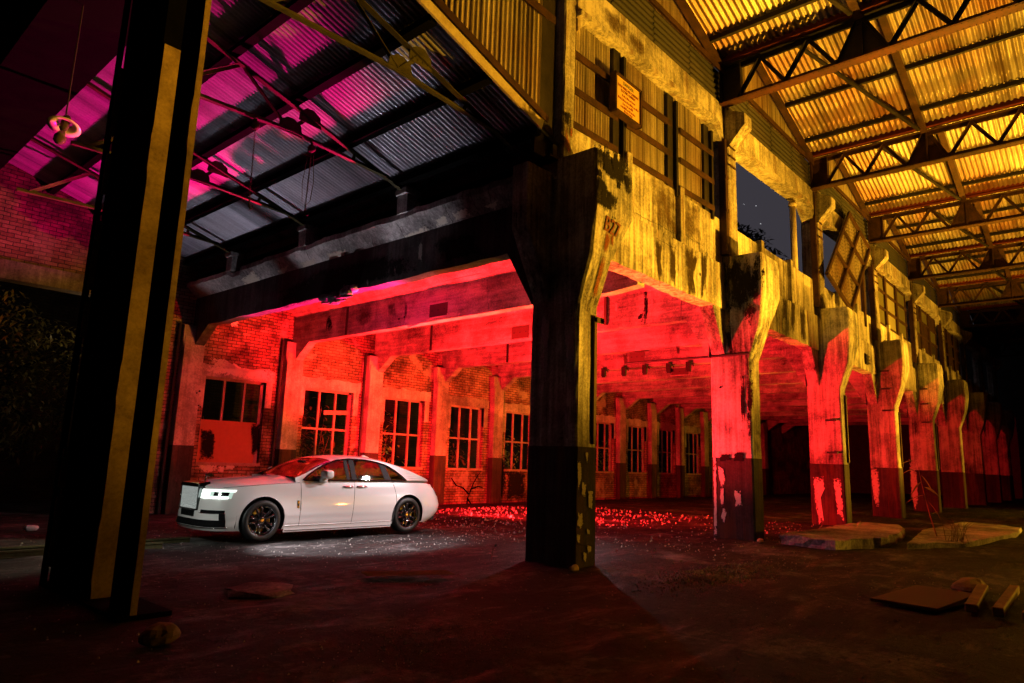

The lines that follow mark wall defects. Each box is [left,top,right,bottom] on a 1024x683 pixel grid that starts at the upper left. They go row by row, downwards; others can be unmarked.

damp [594,144,633,211]
damp [638,178,708,323]
peeling [204,358,274,383]
peeling [577,452,593,562]
peeling [713,452,744,535]
peeling [813,476,844,523]